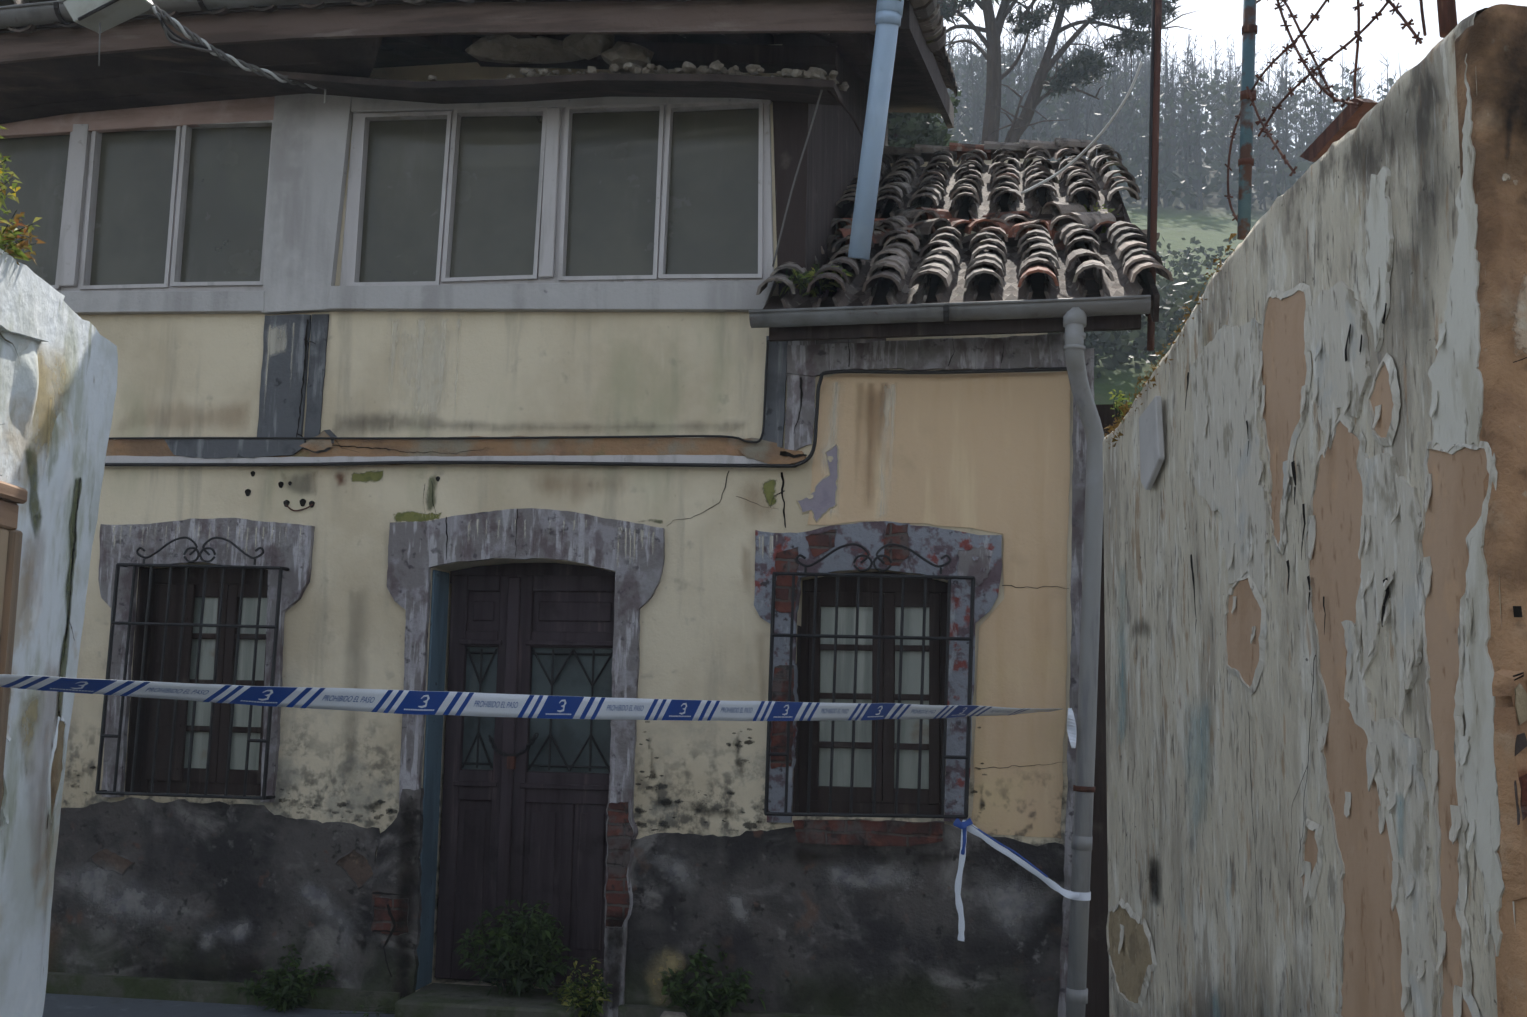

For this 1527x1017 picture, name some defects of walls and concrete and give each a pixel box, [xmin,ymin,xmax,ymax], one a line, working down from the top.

peeling [774,444,839,613]
peeling [1191,54,1527,1017]
damp [635,721,764,831]
damp [332,800,415,999]
damp [606,915,623,1005]
peeling [1106,898,1157,1010]